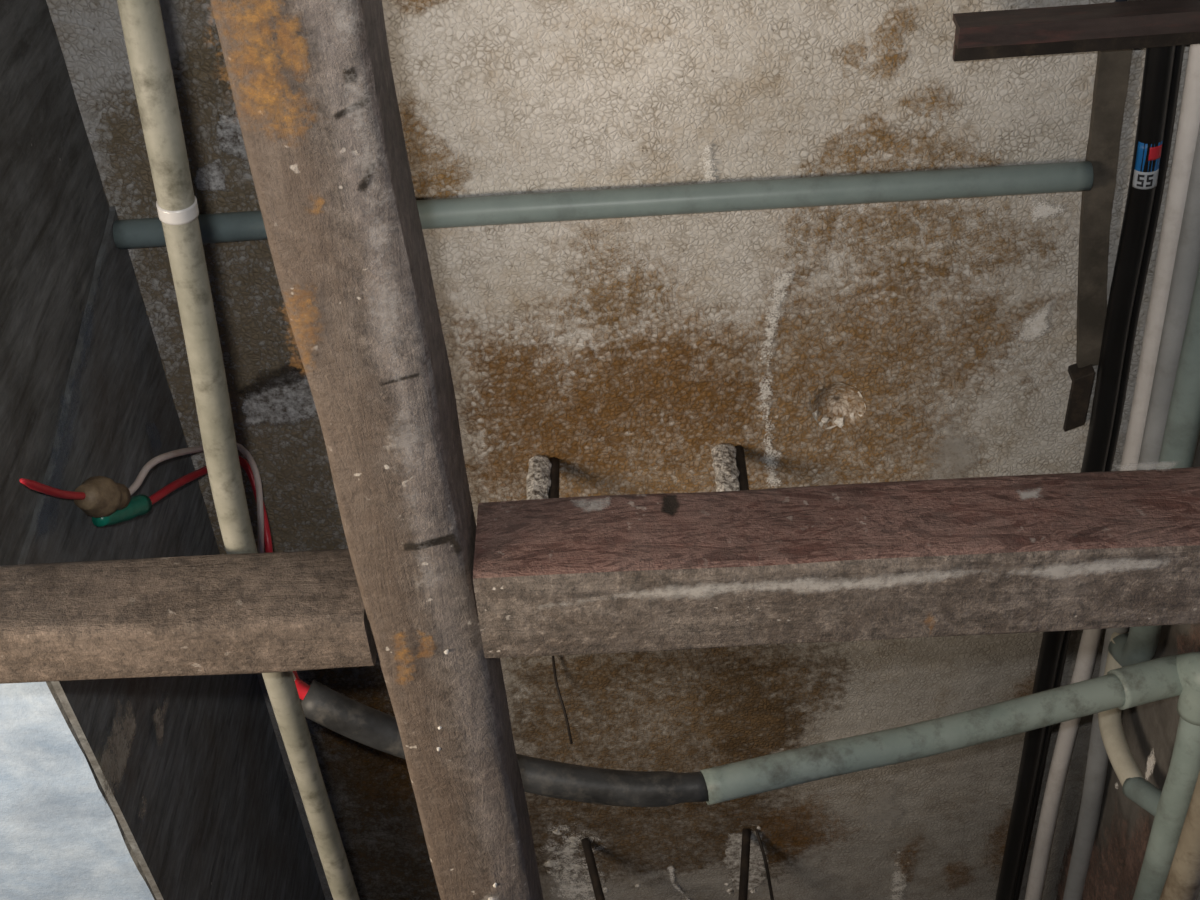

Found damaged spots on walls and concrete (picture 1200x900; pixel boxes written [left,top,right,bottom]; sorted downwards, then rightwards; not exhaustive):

corrosion [213,0,306,132]
damp [844,2,914,78]
damp [702,145,716,183]
damp [802,88,1000,175]
damp [455,198,1055,502]
damp [512,644,850,773]
damp [527,793,836,900]